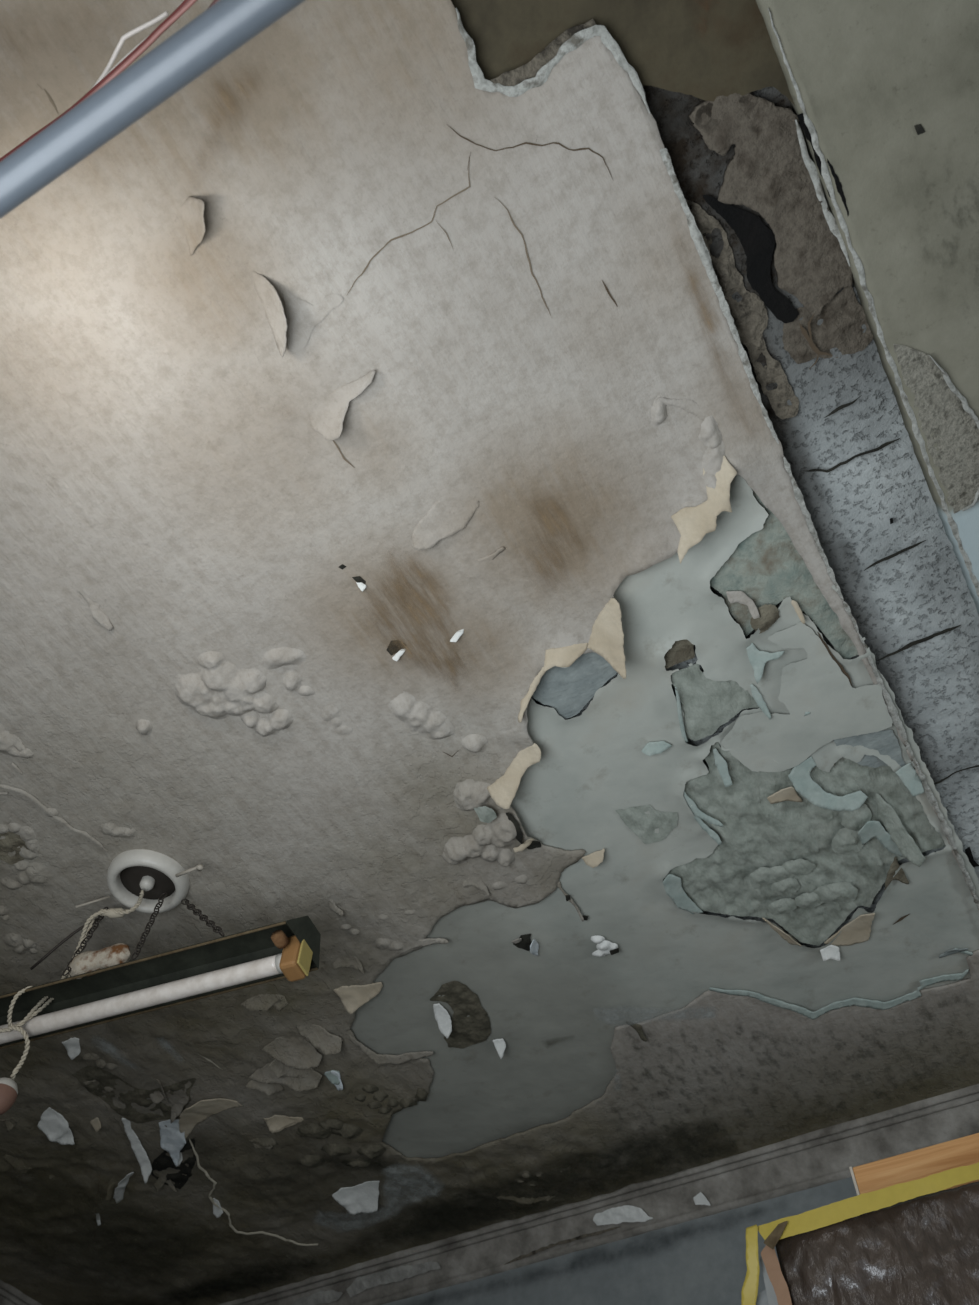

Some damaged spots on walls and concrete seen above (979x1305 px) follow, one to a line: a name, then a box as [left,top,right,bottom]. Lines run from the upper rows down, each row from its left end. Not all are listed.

crack [347,124,613,316]
peeling [253,271,343,357]
spalling [768,9,979,598]
peeling [309,370,376,441]
crack [824,395,862,418]
crack [805,438,900,473]
crack [864,540,926,571]
peeling [334,148,979,1158]
crack [818,633,853,687]
crack [877,625,961,661]
spalling [62,1037,242,1204]
peeling [332,1181,380,1215]